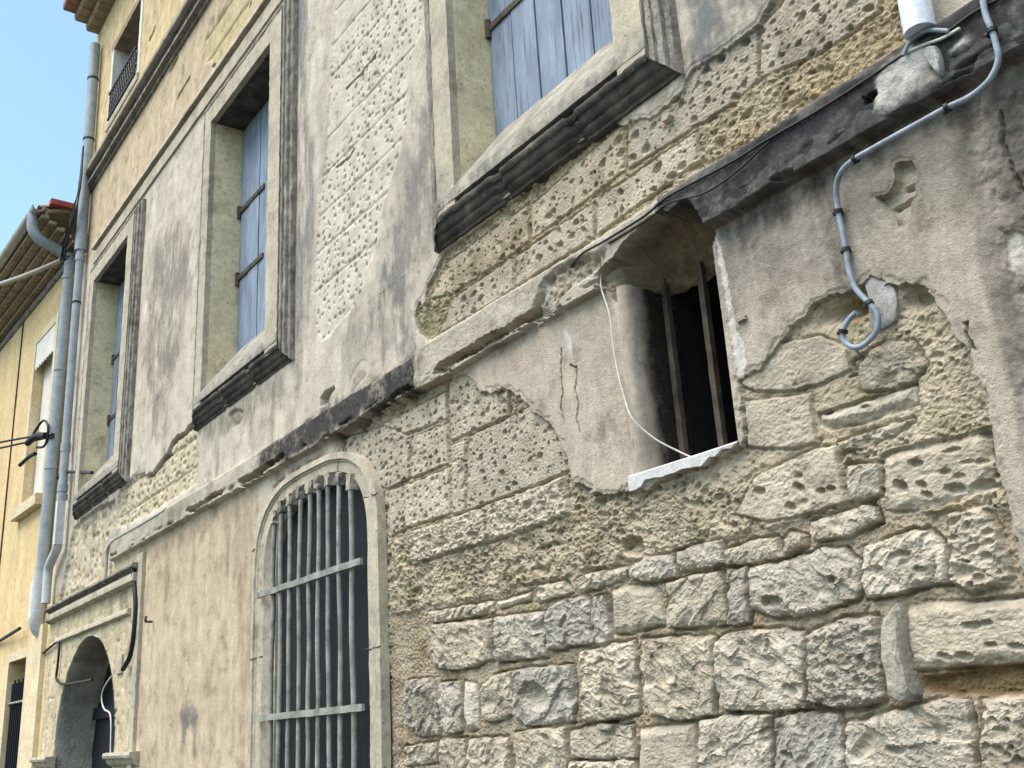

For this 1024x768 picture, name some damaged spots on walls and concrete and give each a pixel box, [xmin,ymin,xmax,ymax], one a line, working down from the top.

crack [560,347,581,434]
spalling [313,0,1024,768]
spalling [59,429,198,601]